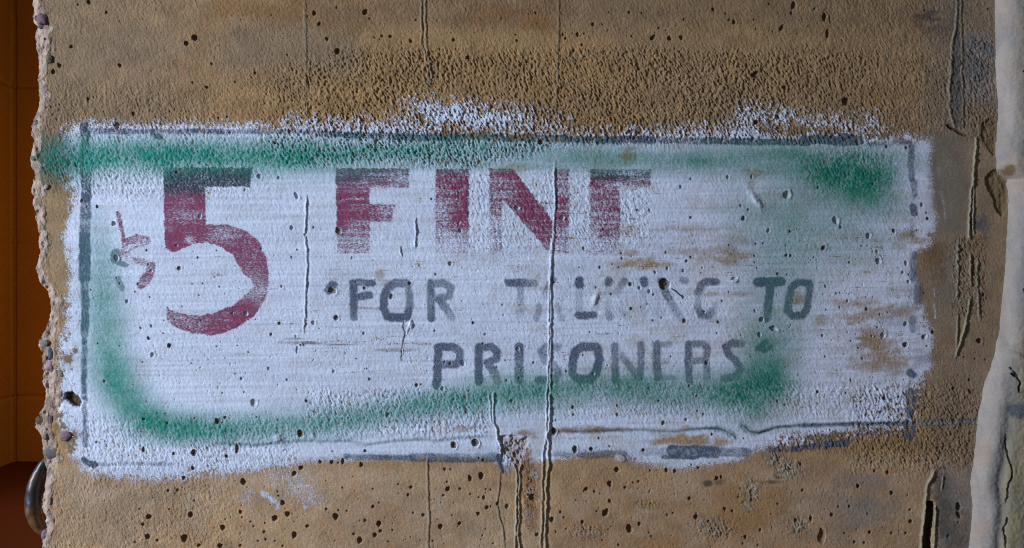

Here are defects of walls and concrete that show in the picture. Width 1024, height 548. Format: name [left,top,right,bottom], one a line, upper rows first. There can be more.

crack [945,124,965,136]
spalling [499,435,529,465]